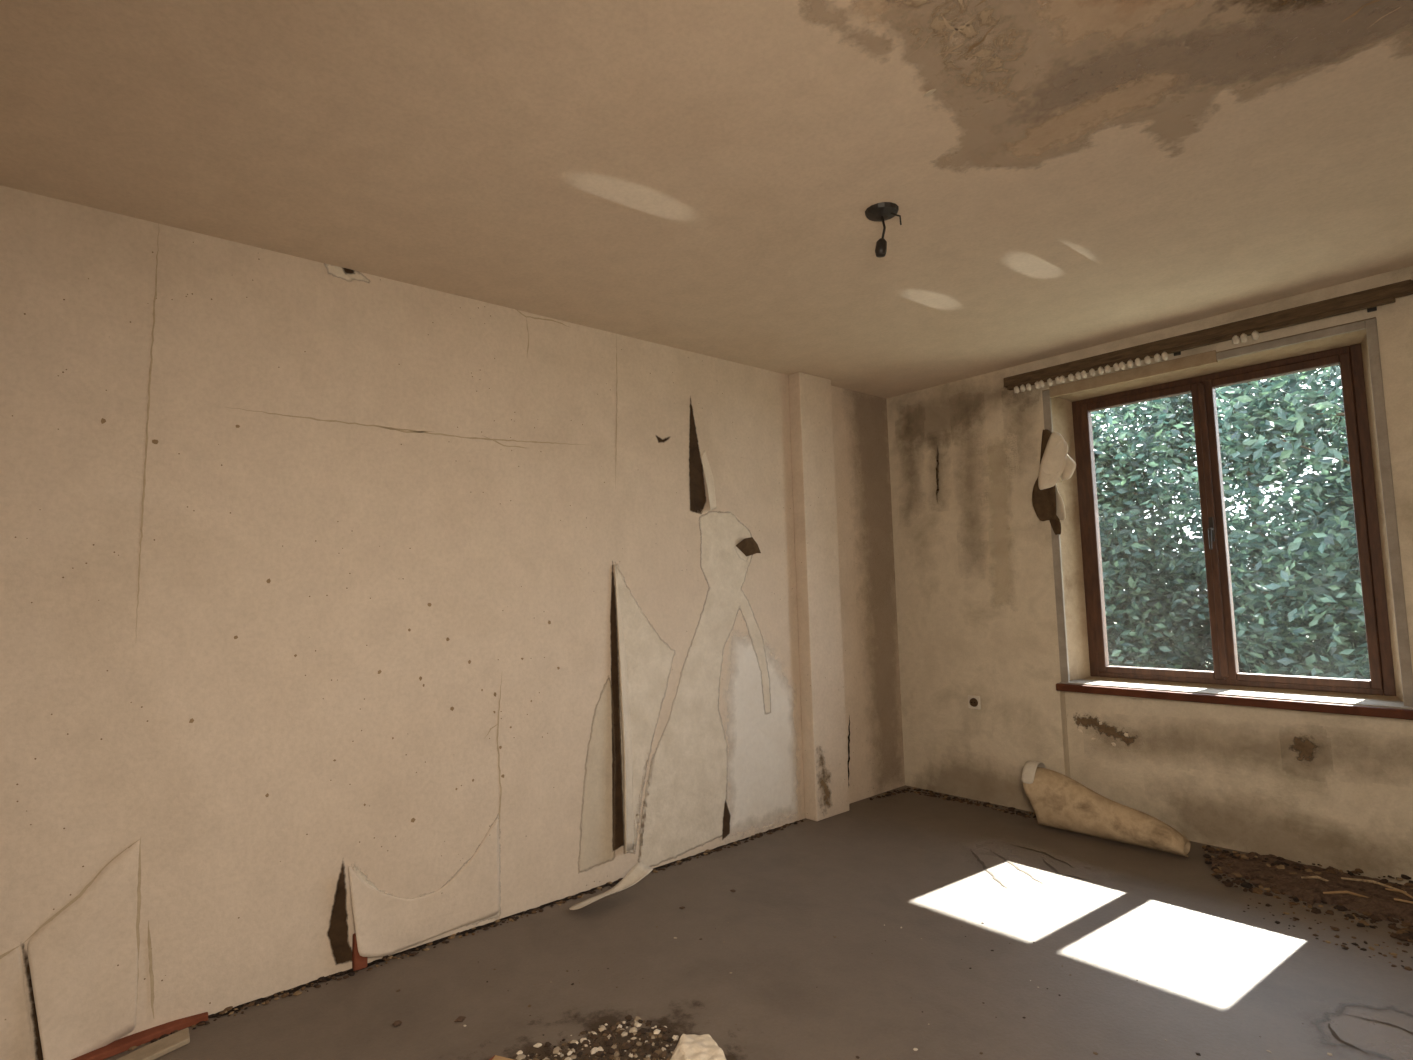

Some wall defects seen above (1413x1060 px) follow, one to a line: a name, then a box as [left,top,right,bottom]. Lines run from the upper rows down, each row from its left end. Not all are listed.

damp [1009,74,1175,155]
peeling [1032,429,1076,535]
peeling [639,511,771,867]